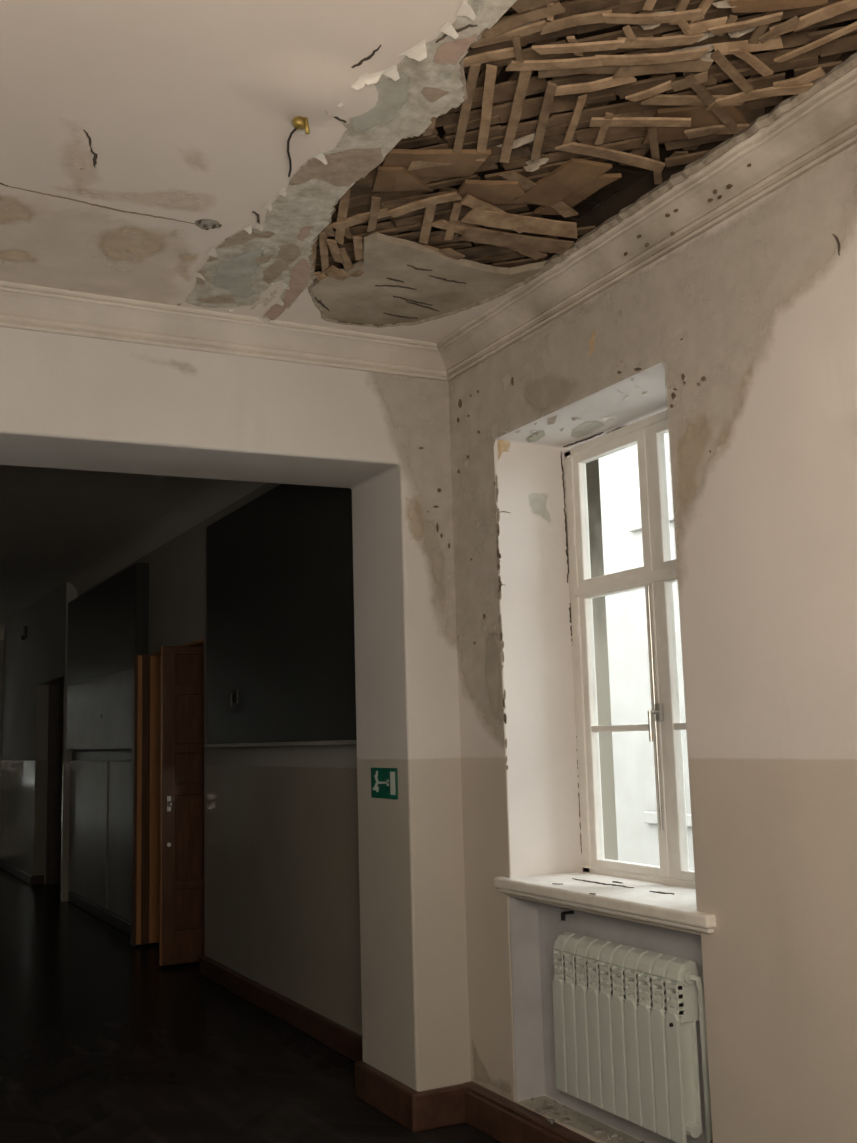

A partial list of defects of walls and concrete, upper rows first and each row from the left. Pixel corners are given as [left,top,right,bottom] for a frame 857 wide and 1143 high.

crack [83,129,98,168]
spalling [178,0,857,328]
crack [0,183,196,224]
spalling [670,373,706,408]
peeling [497,415,614,460]
spalling [483,475,504,671]